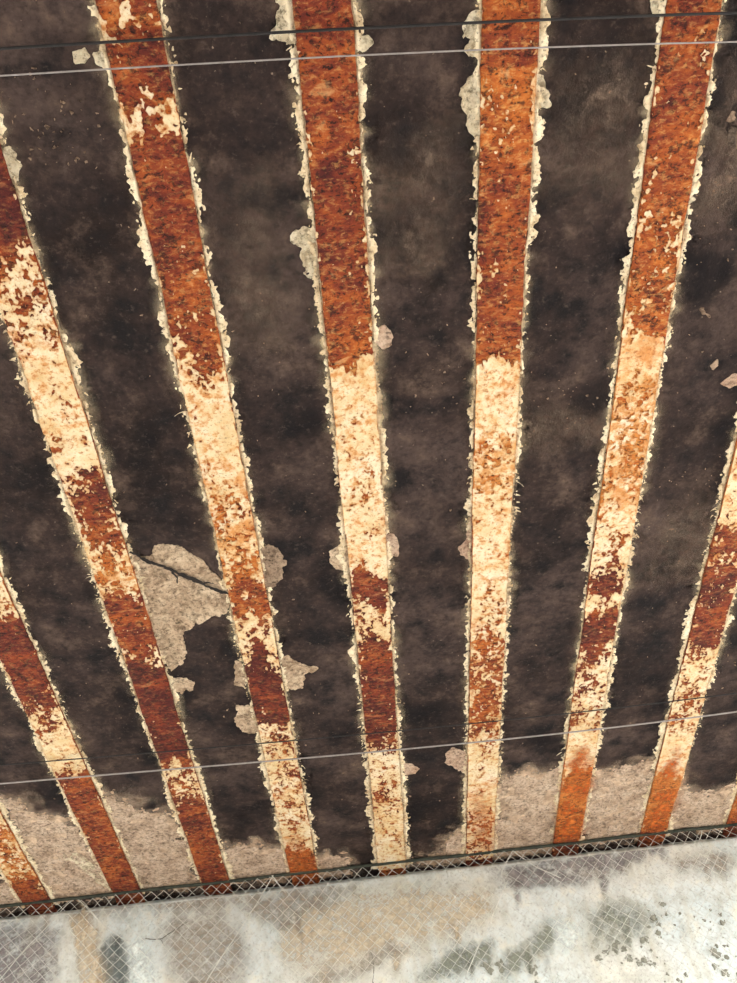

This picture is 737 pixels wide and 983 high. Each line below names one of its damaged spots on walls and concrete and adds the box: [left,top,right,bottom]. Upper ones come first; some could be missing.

peeling [0,0,353,911]
peeling [269,0,737,870]
crack [129,551,228,594]
rust [556,749,591,840]
rust [646,759,676,829]
leakage [506,848,662,901]
leakage [679,854,727,872]
leakage [0,921,58,983]
leakage [99,937,153,983]
leakage [150,887,335,983]
leakage [427,919,577,979]
leakage [594,905,653,947]